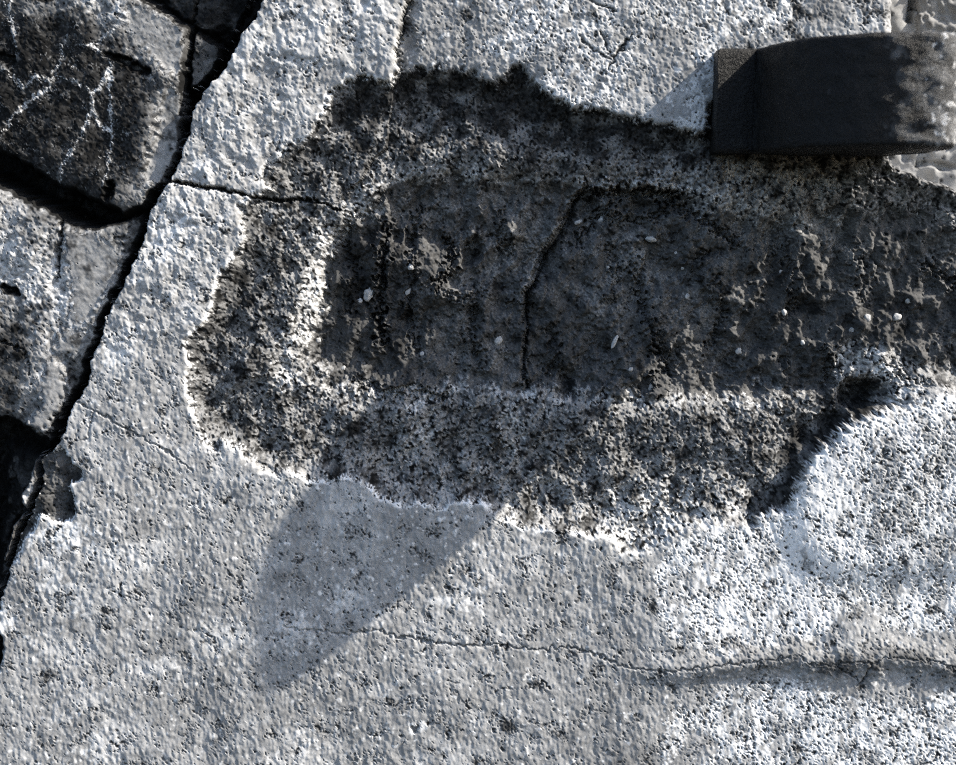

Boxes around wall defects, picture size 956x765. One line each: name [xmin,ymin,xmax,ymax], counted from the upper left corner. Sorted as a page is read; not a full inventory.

crack [184,0,263,137]
crack [171,180,341,212]
crack [56,219,67,275]
crack [0,339,31,376]
crack [38,402,194,473]
crack [283,626,956,684]